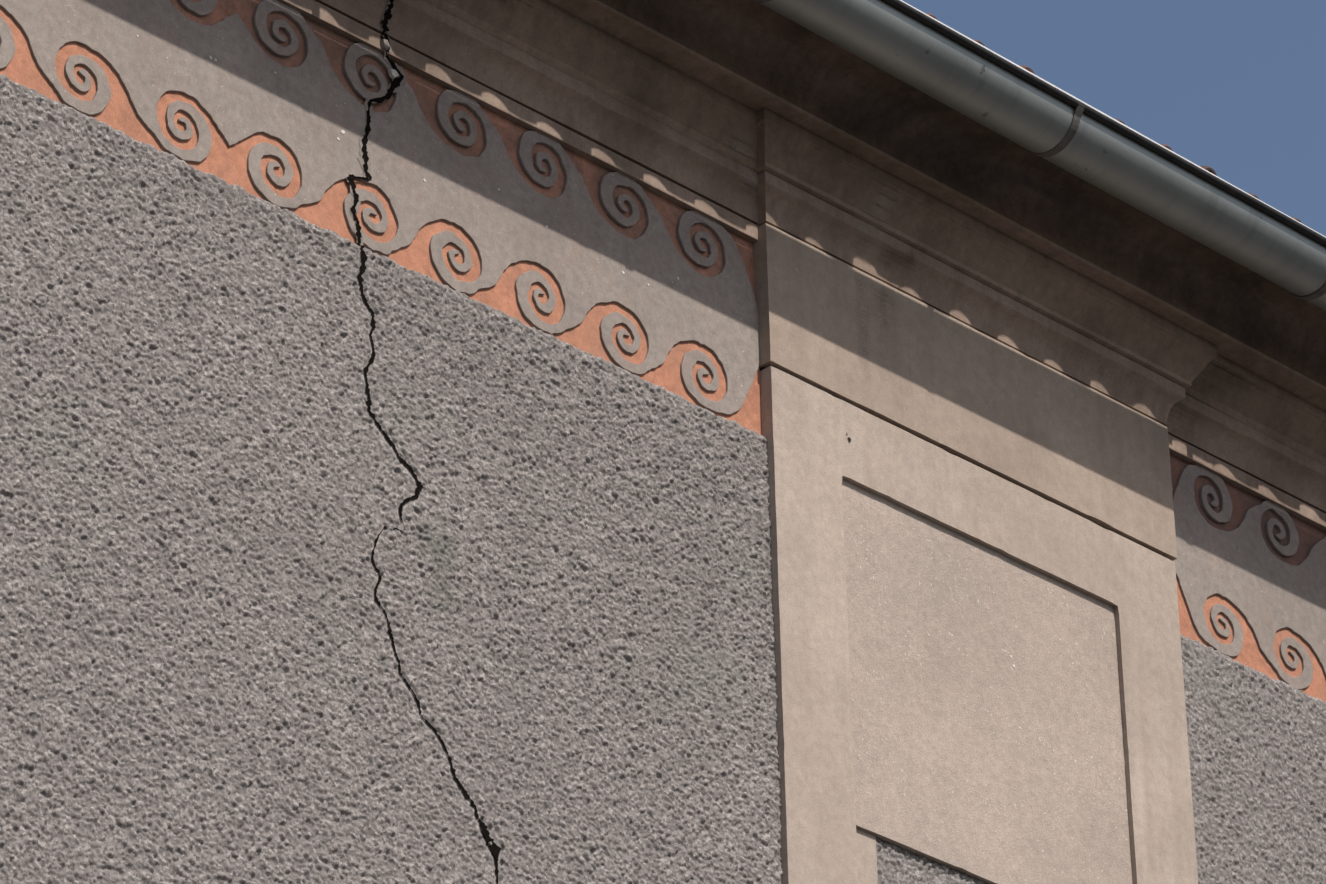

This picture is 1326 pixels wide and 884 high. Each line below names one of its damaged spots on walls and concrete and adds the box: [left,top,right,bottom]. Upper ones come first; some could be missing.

crack [346,0,507,884]